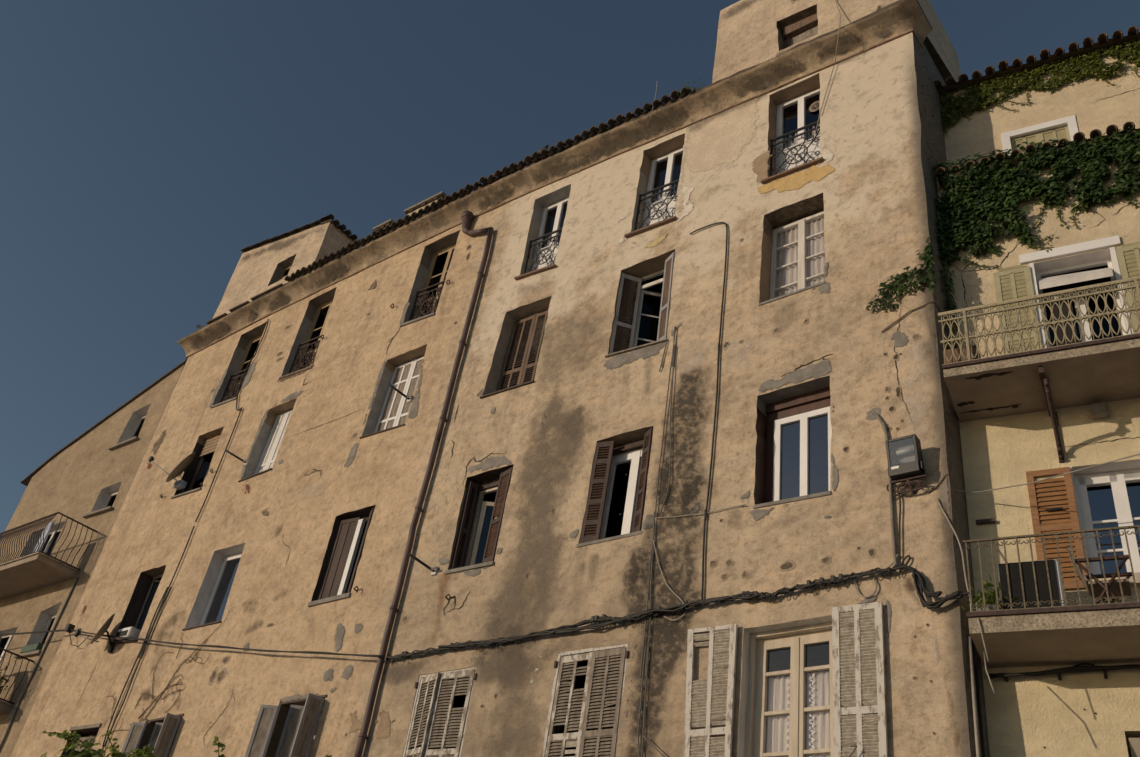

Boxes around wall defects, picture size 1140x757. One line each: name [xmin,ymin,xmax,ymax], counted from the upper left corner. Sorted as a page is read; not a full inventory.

damp [736,49,802,96]
peeling [677,97,837,221]
crack [894,308,915,431]
damp [479,400,583,757]
damp [625,369,705,757]